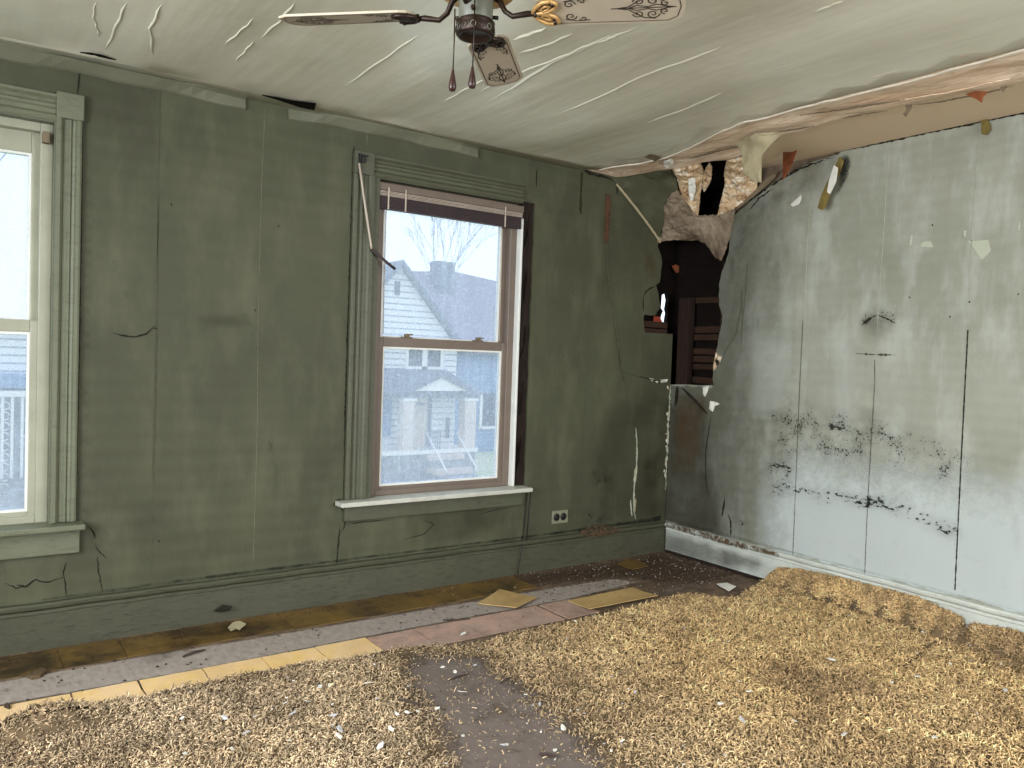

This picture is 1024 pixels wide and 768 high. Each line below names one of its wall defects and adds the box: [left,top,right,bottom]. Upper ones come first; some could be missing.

crack [114,326,158,337]
flaking render [644,152,840,556]
peeling [630,428,638,519]
leakage [770,410,1024,613]
crack [4,562,67,595]